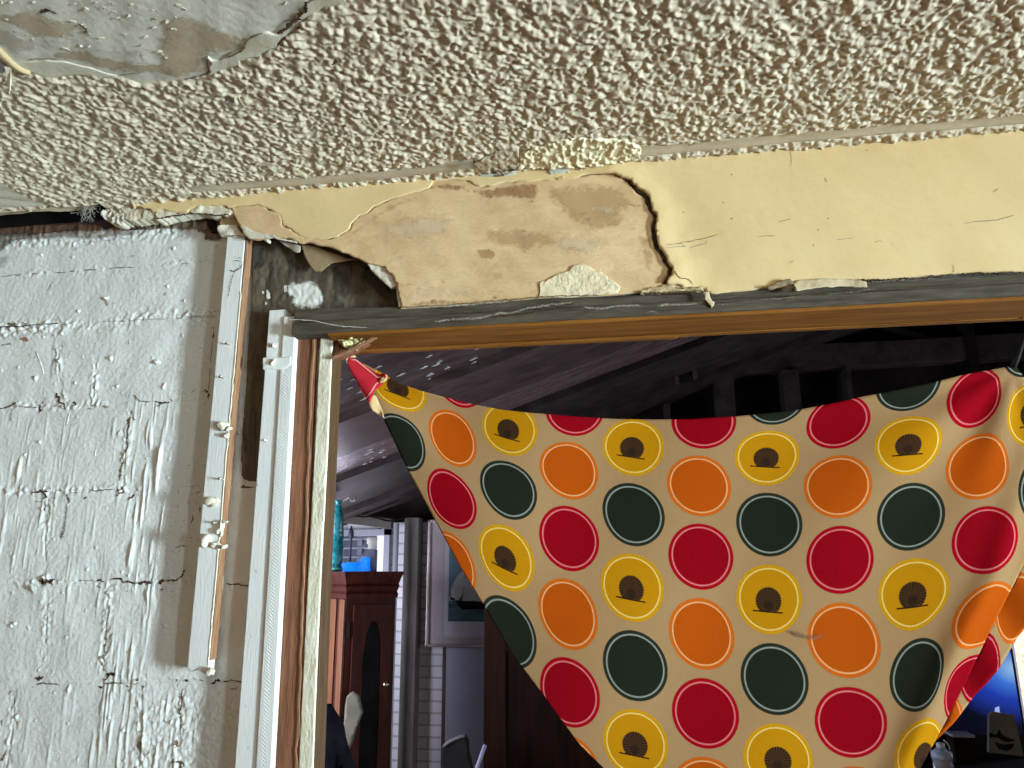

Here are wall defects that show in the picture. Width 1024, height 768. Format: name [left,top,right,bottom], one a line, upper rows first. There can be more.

peeling [0,0,345,83]
flaking render [114,167,668,488]
crack [581,173,717,296]
crack [0,235,243,768]